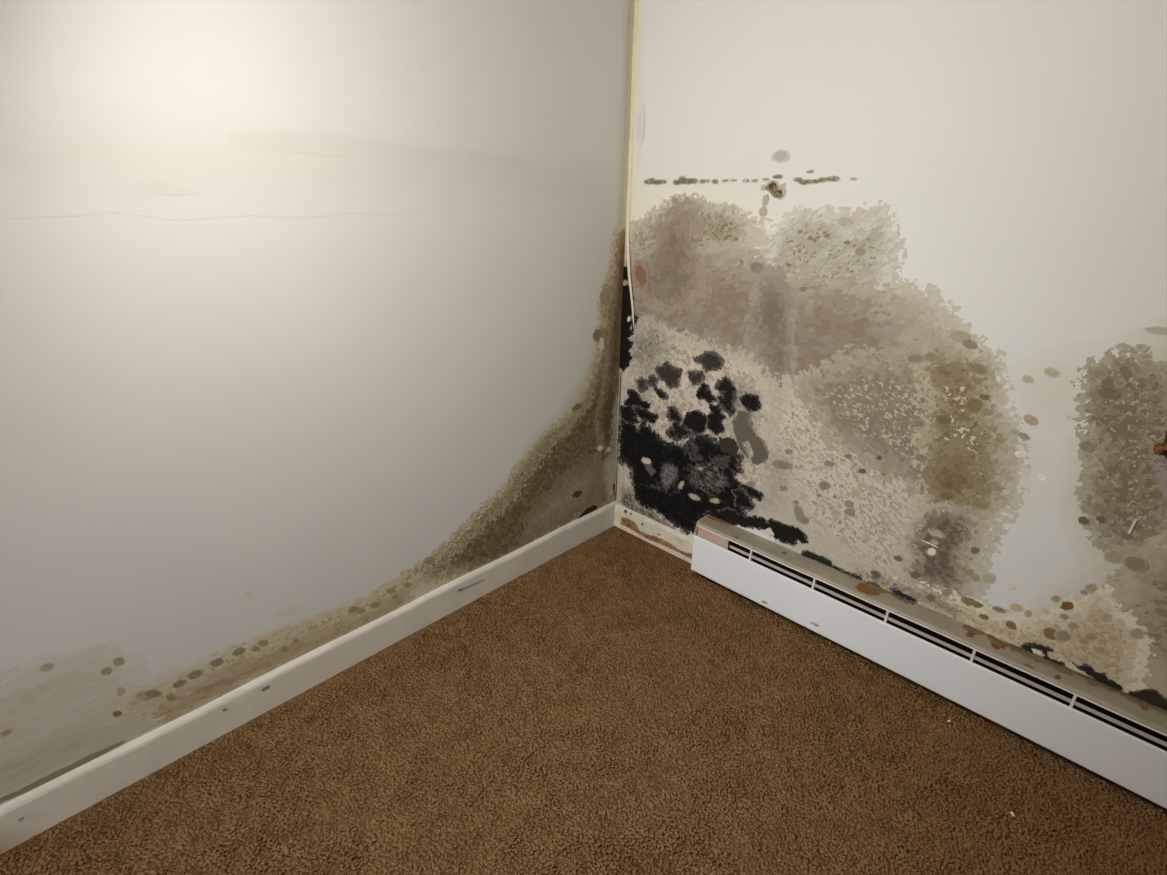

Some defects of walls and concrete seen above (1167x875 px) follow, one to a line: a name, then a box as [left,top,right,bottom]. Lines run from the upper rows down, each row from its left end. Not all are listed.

mould [654,361,683,389]
mould [924,360,970,390]
mould [624,376,655,410]
mould [620,404,659,424]
mould [665,405,697,442]
mould [682,404,726,436]
mould [687,370,737,418]
mould [726,373,763,427]
mould [732,409,769,467]
corrosion [1153,430,1167,459]
mould [683,443,731,498]
mould [741,481,764,504]